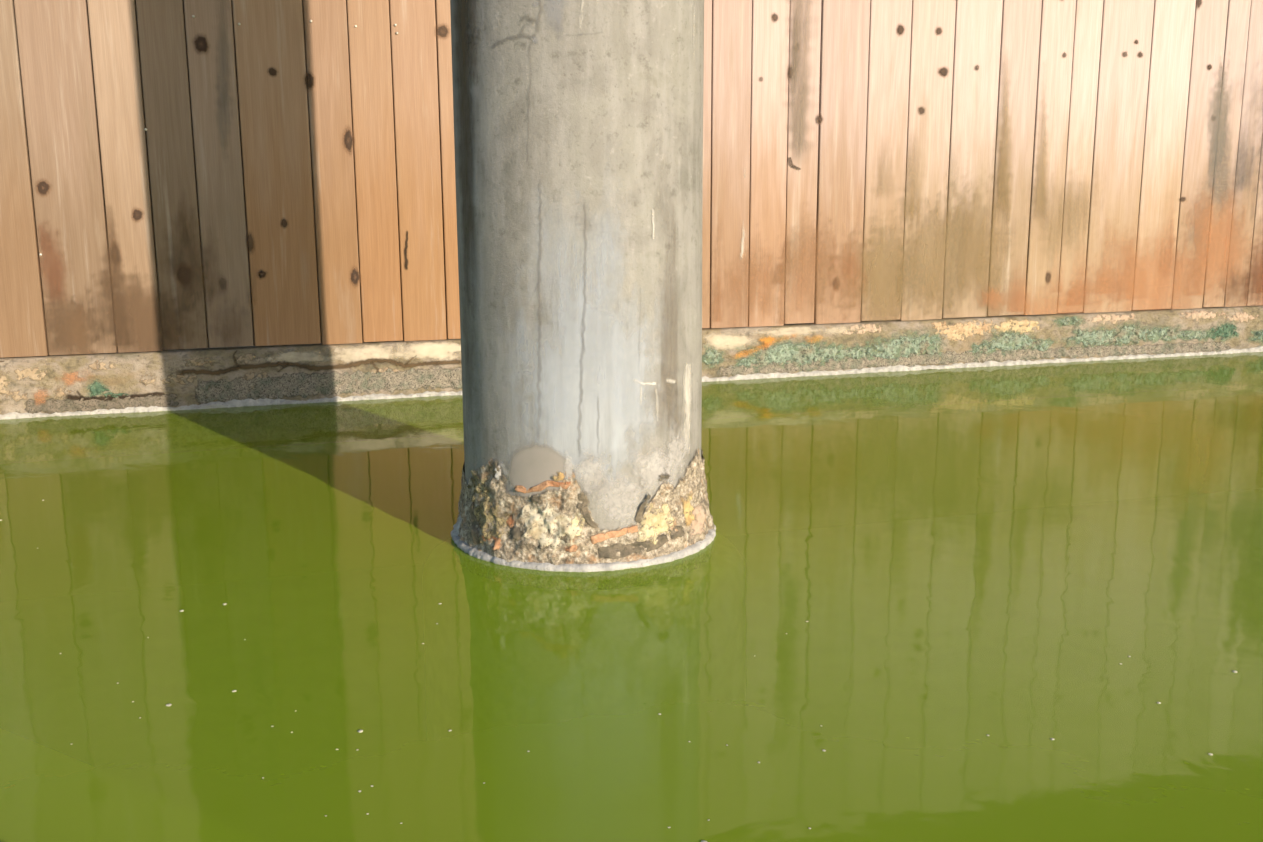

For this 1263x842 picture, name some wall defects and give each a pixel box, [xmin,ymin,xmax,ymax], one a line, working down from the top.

damp [793,63,807,147]
damp [1000,115,1010,203]
damp [1213,92,1245,197]
damp [45,236,182,354]
crack [67,351,461,401]
damp [969,316,1263,355]
spalling [451,446,715,591]